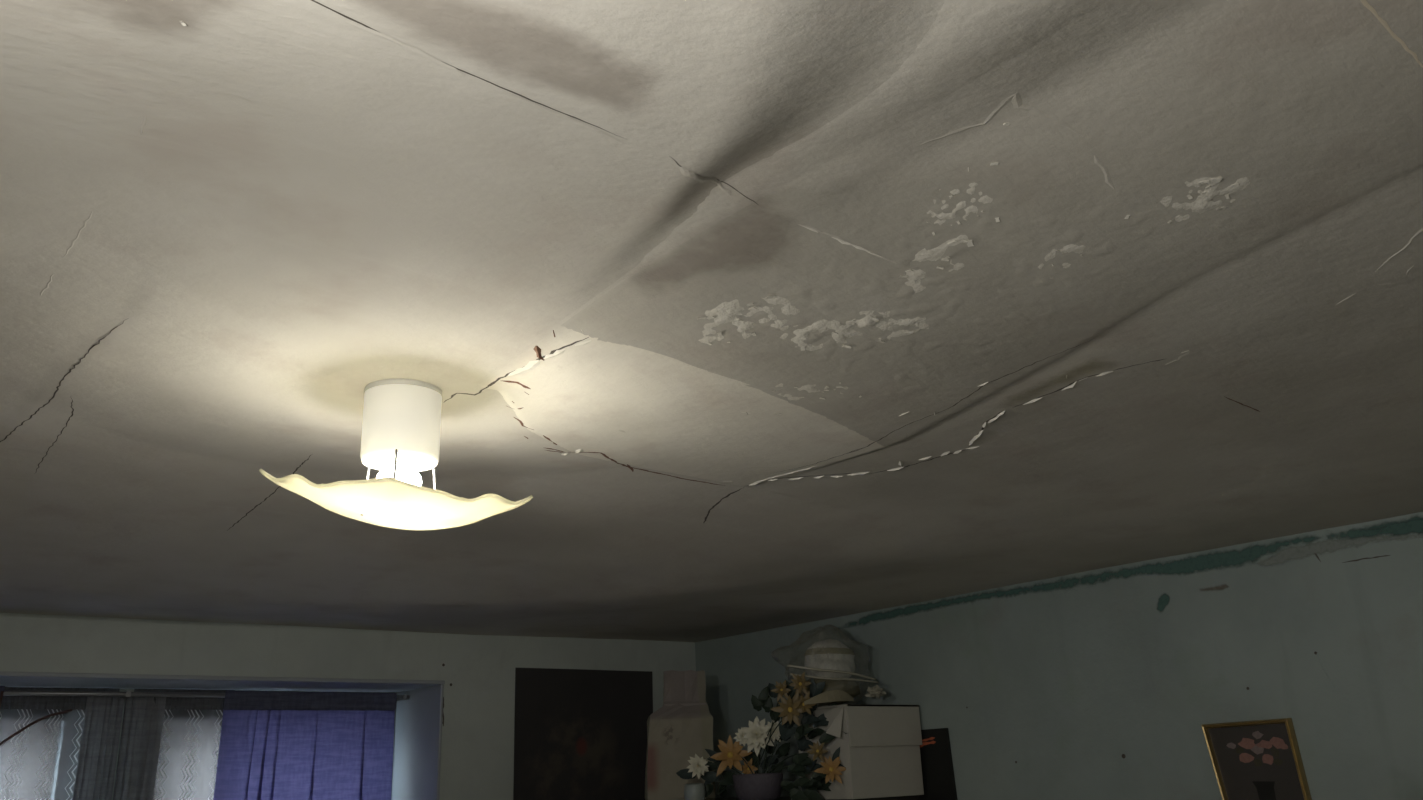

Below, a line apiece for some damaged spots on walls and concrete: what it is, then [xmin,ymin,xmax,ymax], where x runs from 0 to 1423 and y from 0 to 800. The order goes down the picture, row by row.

crack [311,0,623,143]
crack [672,158,758,205]
peeling [899,167,1000,294]
peeling [1160,176,1250,224]
peeling [697,296,929,351]
crack [0,321,124,472]
crack [443,335,1224,523]